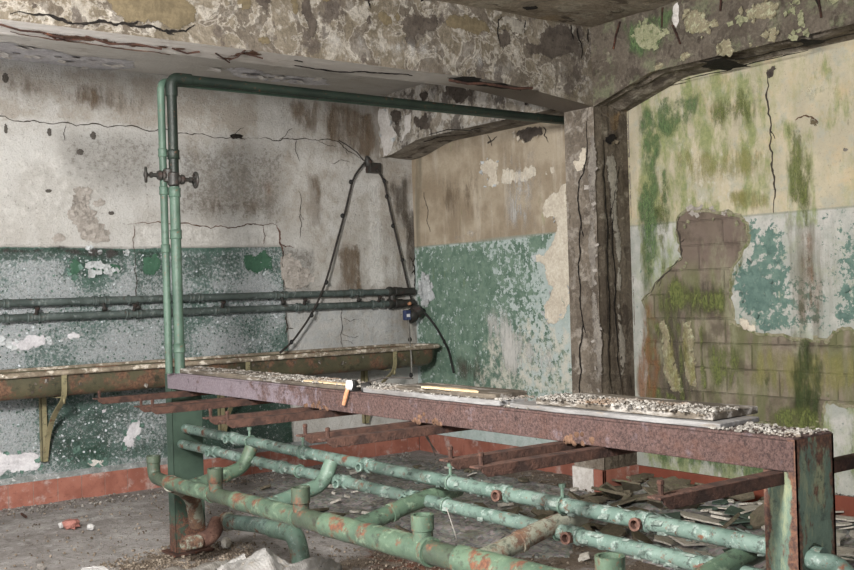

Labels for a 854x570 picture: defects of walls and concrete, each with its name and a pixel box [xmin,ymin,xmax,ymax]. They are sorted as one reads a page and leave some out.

crack [10,11,194,55]
crack [0,115,364,164]
crack [670,33,854,213]
crack [128,192,304,295]
peeling [182,252,283,358]
peeling [417,272,435,307]
peeling [531,184,570,325]
crack [577,121,631,393]
leakage [638,183,663,273]
peeling [732,258,777,331]
peeling [0,245,174,475]